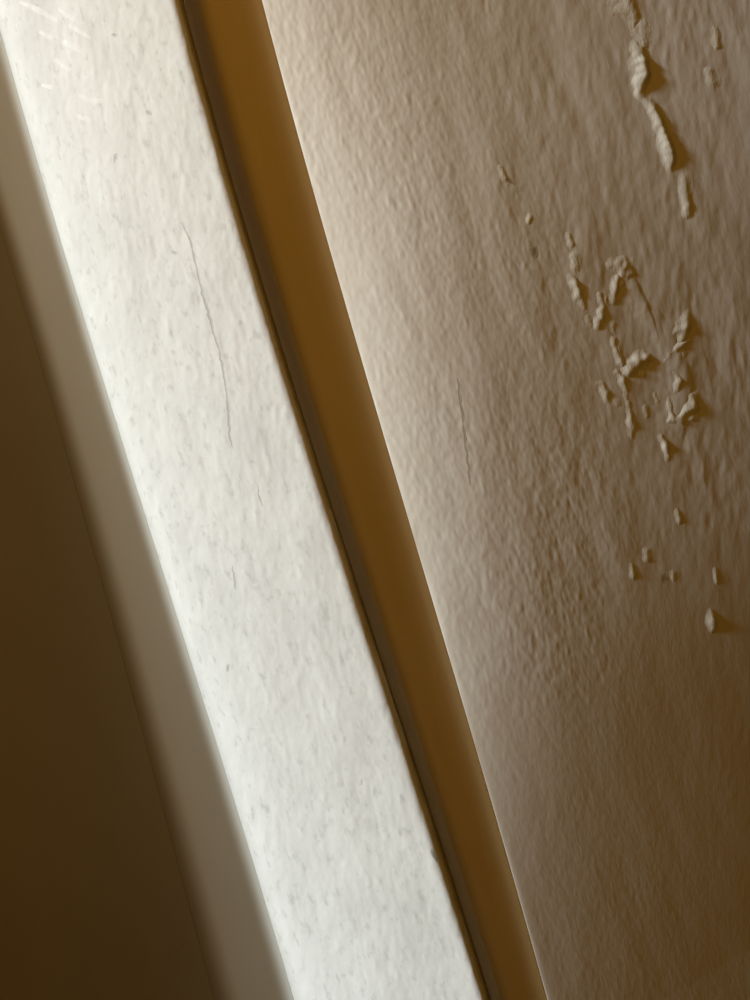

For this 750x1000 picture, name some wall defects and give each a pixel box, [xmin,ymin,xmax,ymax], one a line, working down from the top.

peeling [606,0,695,221]
crack [181,222,232,447]